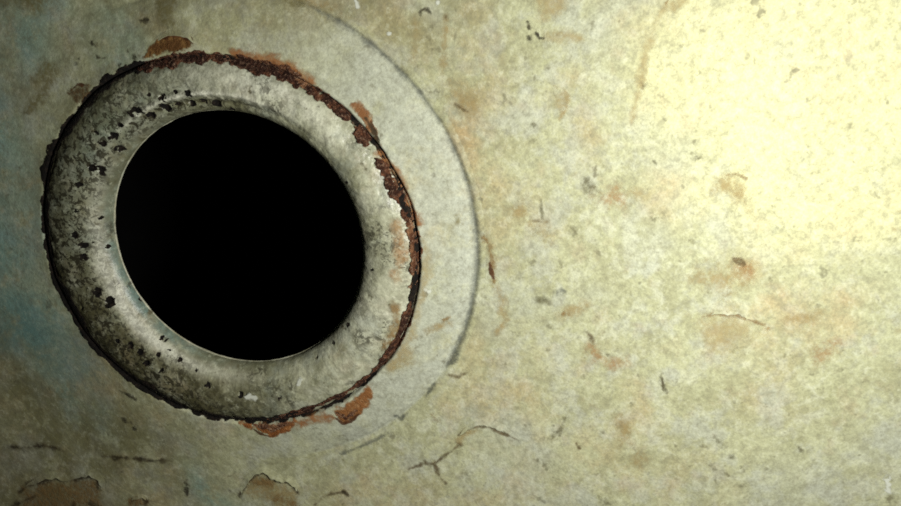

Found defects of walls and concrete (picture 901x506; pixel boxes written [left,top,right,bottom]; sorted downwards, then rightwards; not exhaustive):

rust [40,30,423,438]
crack [413,419,512,483]
peeling [237,466,301,506]